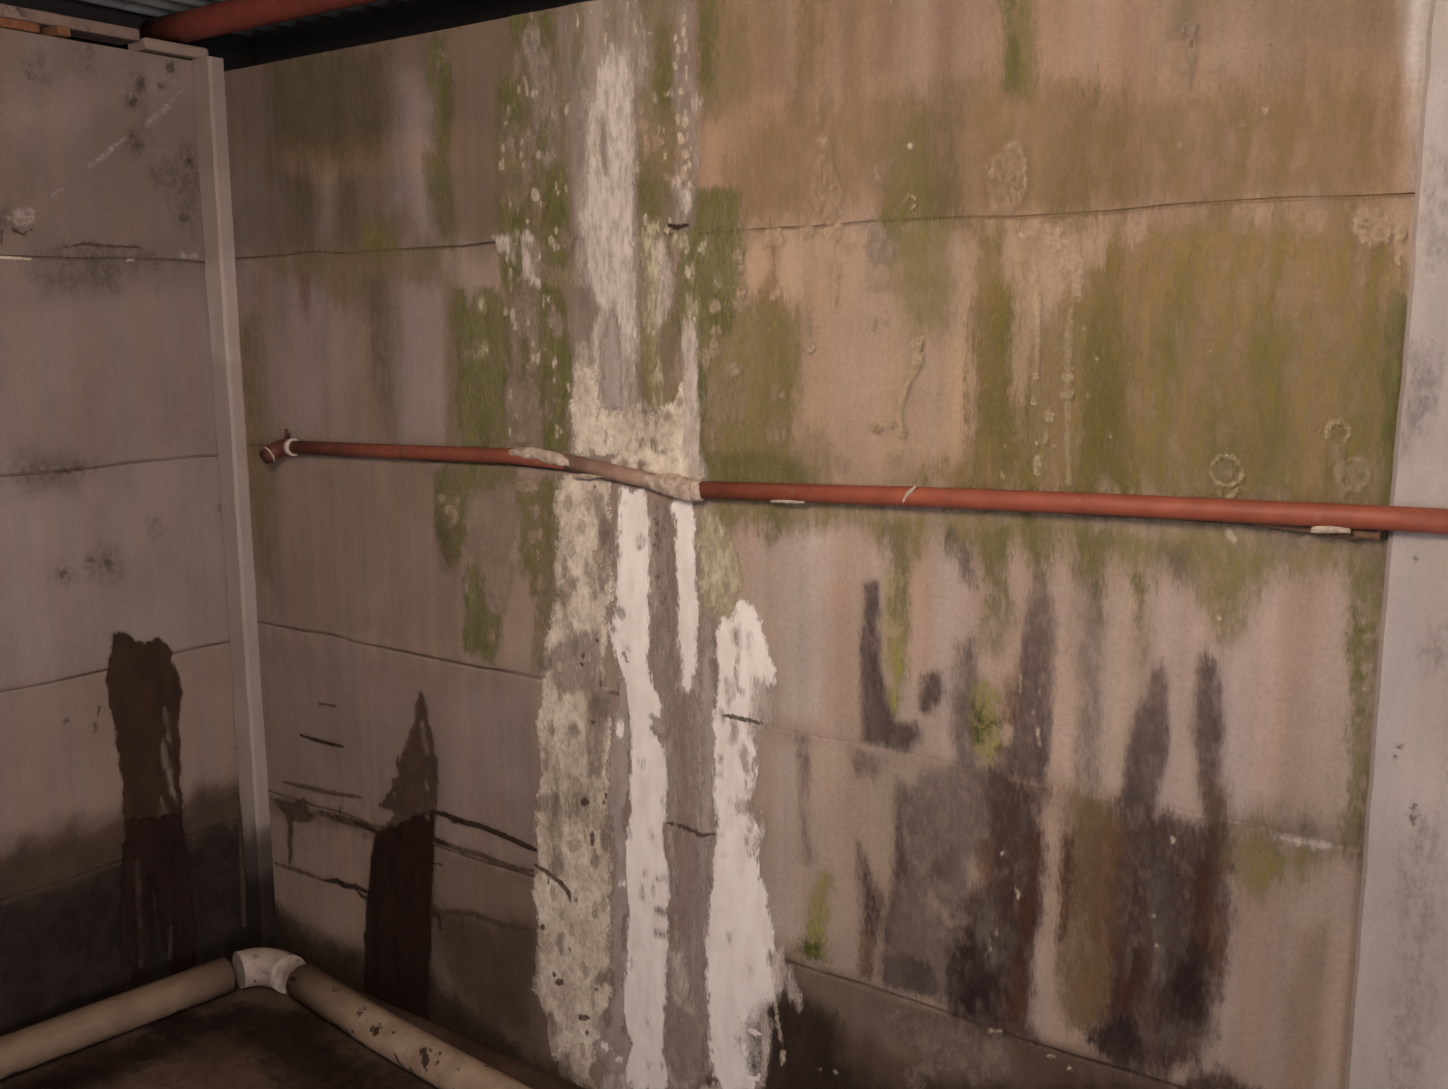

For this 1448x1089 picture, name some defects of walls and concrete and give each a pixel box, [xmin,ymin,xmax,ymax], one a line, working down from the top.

water stain [975,228,1015,488]
water stain [1380,295,1406,504]
water stain [270,0,871,1089]
water stain [0,632,249,1037]
crack [299,703,344,748]
crack [275,862,368,899]
crack [282,781,380,837]
crack [431,903,528,931]
crack [429,810,537,872]
peeling [784,968,802,1011]
water stain [854,581,1051,1045]
water stain [1088,651,1245,1089]